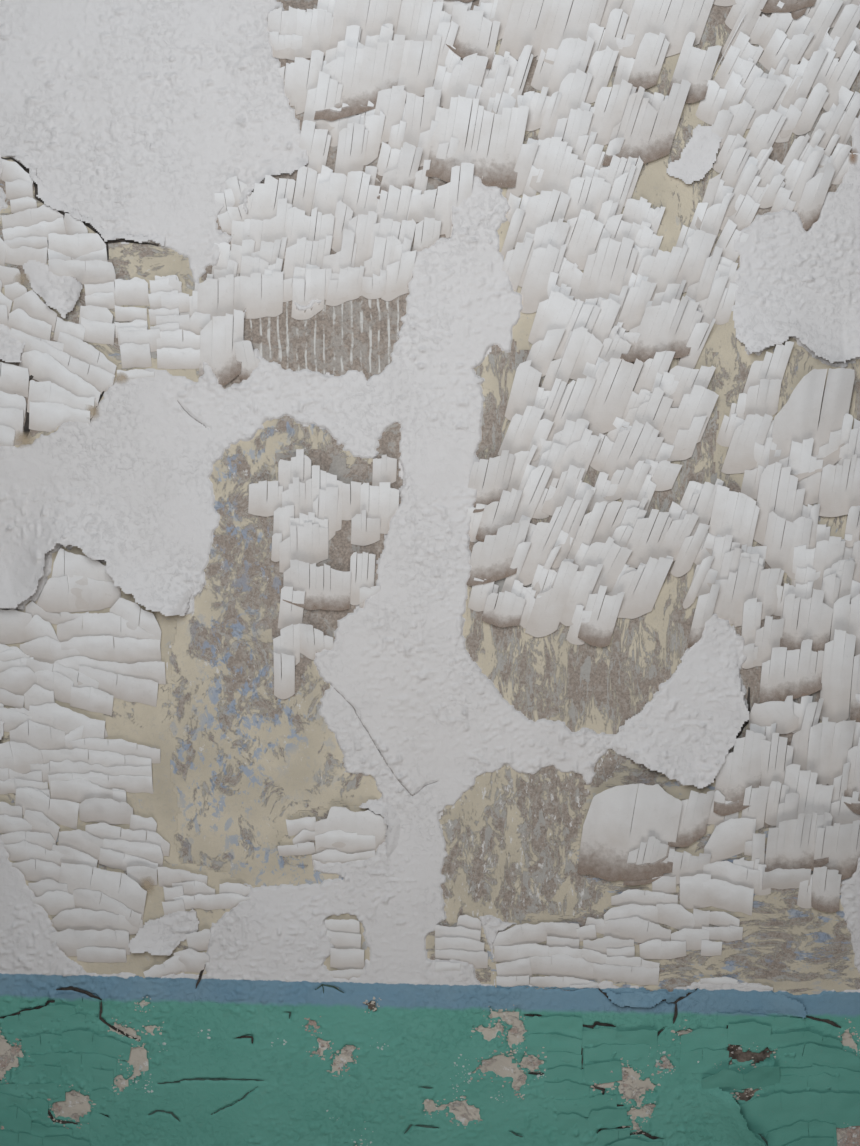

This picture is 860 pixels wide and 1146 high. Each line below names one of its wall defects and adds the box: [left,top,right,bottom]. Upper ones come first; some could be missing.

peeling [422,0,860,1146]
flaking render [0,415,403,989]
peeling [0,1030,30,1084]
crack [0,986,140,1041]
peeling [108,997,164,1095]
peeling [302,1016,360,1077]
crack [581,989,659,1139]
crack [656,988,697,1037]
crack [806,1016,841,1040]
peeling [47,1085,96,1129]
crack [48,1111,108,1125]
crack [148,1078,264,1122]